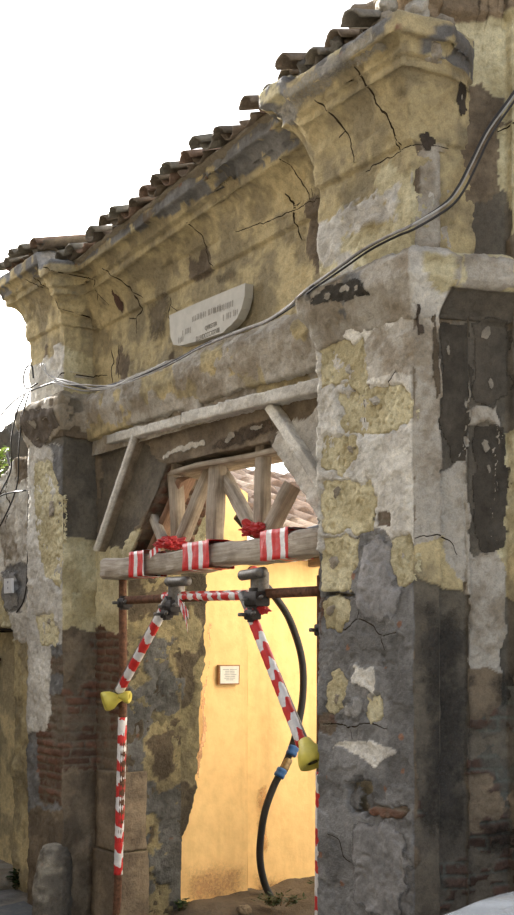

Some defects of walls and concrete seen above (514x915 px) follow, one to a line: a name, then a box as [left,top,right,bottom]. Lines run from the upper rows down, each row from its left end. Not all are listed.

crack [314,62,452,176]
crack [235,156,320,241]
flaking render [310,278,370,305]
flaking render [19,408,60,448]
flaking render [415,304,514,553]
spalling [34,460,68,589]
spalling [320,337,422,632]
spalling [326,668,348,715]
spalling [366,693,384,724]